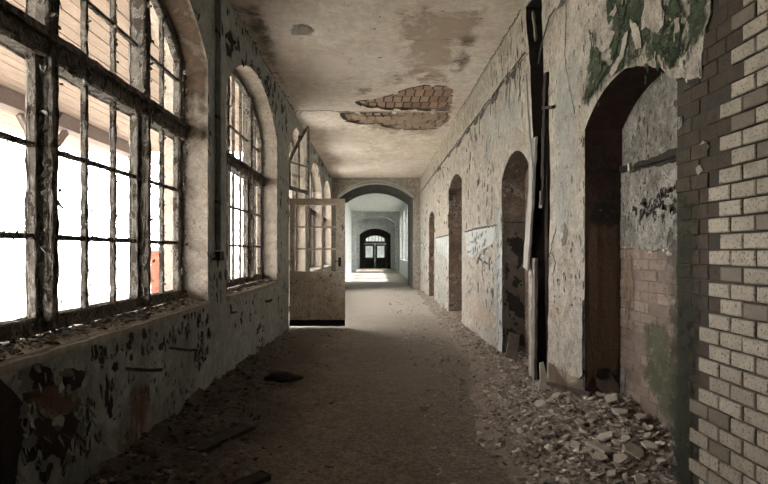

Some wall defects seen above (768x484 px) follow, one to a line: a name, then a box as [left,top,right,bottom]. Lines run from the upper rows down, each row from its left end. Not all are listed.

peeling [40,147,145,304]
flaking render [0,226,265,484]
peeling [134,2,188,254]
damp [292,24,313,35]
flaking render [340,84,458,131]
flaking render [465,124,525,353]
flaking render [599,0,768,484]